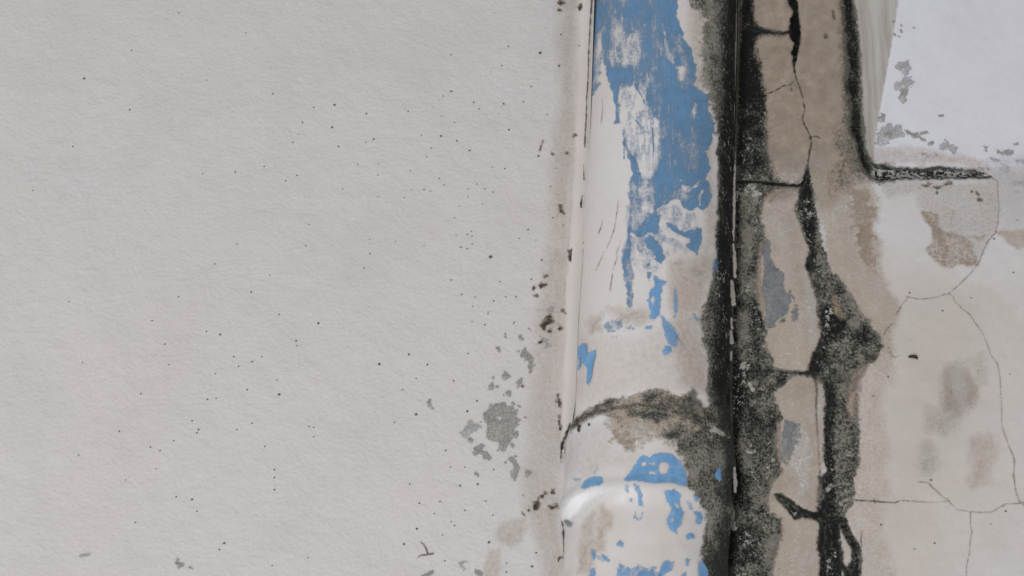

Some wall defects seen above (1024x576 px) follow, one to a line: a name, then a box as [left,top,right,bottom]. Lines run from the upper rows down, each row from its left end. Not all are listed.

peeling [591,0,715,355]
crack [737,0,835,187]
flaking render [894,59,915,103]
flaking render [874,113,958,157]
damp [555,0,992,576]
flaking render [761,239,816,339]
flaking render [459,333,535,481]
peeling [581,476,602,489]
peeling [624,453,703,540]
peeling [590,549,708,576]